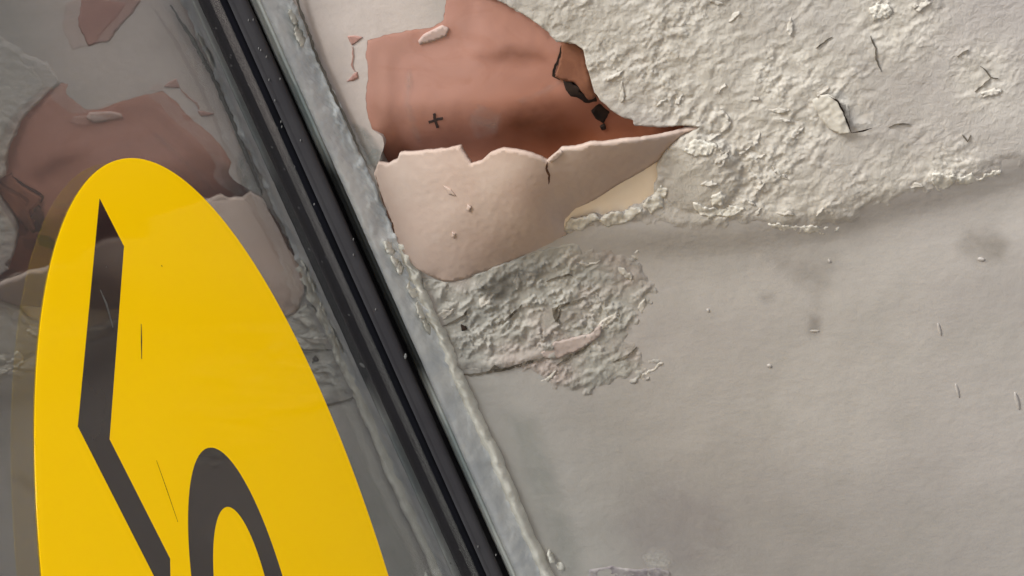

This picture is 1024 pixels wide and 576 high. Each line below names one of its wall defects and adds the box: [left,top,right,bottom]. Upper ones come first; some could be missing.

flaking render [347,0,1024,396]
crack [829,96,908,133]